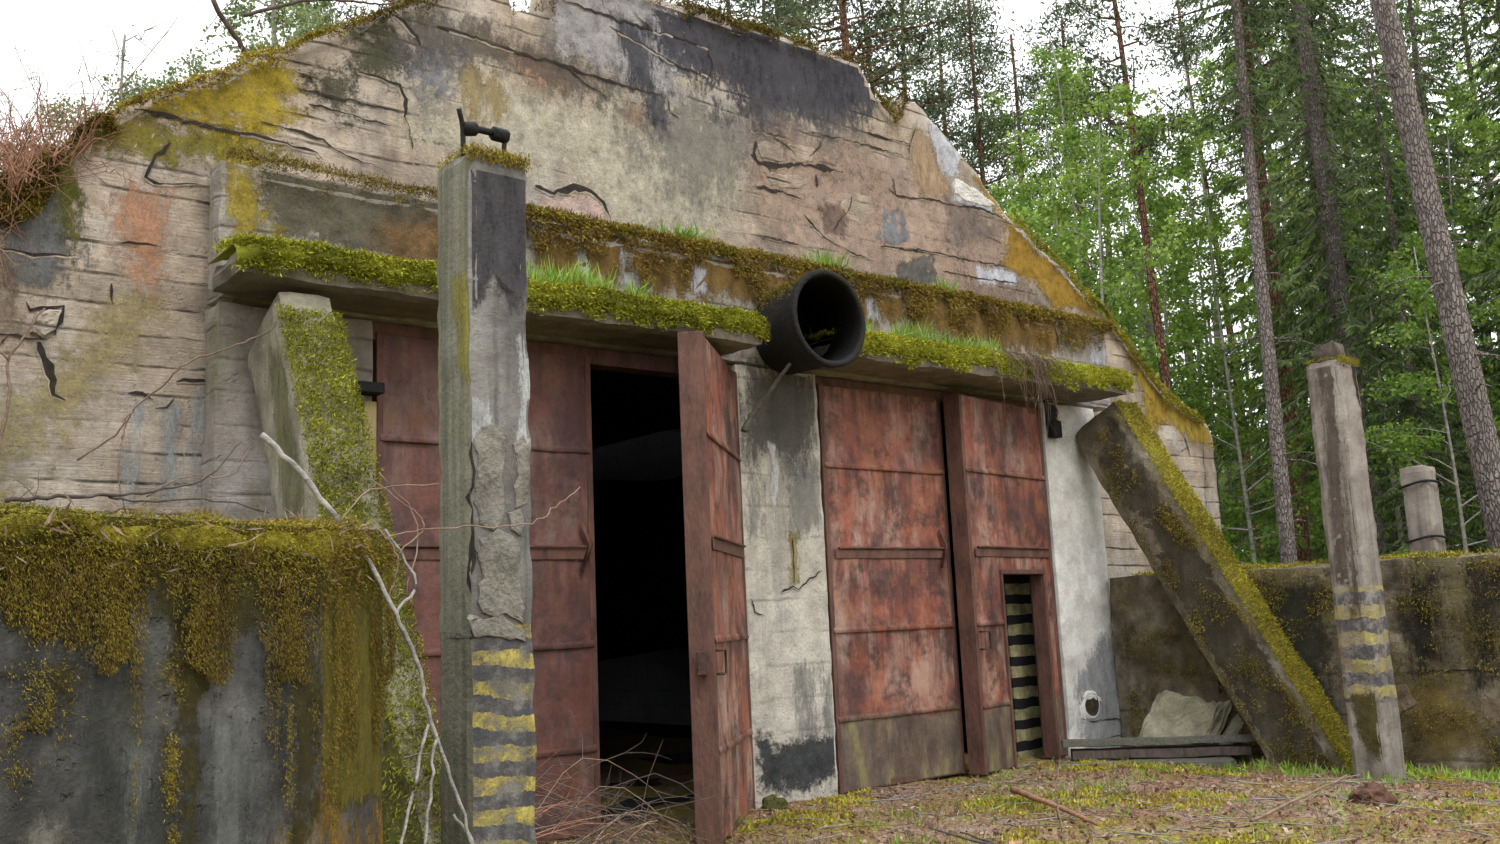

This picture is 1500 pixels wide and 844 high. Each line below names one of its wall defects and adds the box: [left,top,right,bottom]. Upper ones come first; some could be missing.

crack [535,183,611,221]
leakage [389,0,1106,366]
crack [750,129,1060,348]
crack [0,302,65,401]
spalling [446,424,531,642]